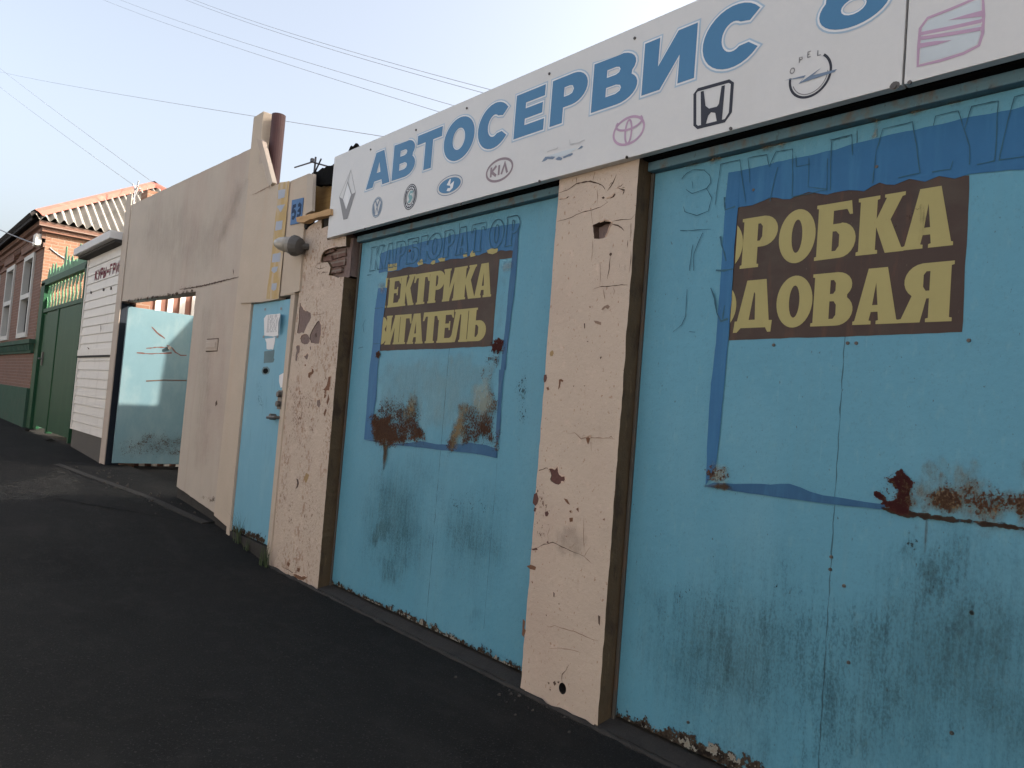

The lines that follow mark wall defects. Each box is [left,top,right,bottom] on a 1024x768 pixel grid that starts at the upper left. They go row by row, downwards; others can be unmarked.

spalling [319,243,352,278]
spalling [593,219,612,239]
peeling [295,303,321,378]
rust [446,338,506,452]
rust [369,395,425,469]
peeling [539,465,566,485]
rust [704,466,729,490]
rust [874,469,1024,542]
rust [332,580,521,670]
rust [616,708,764,768]